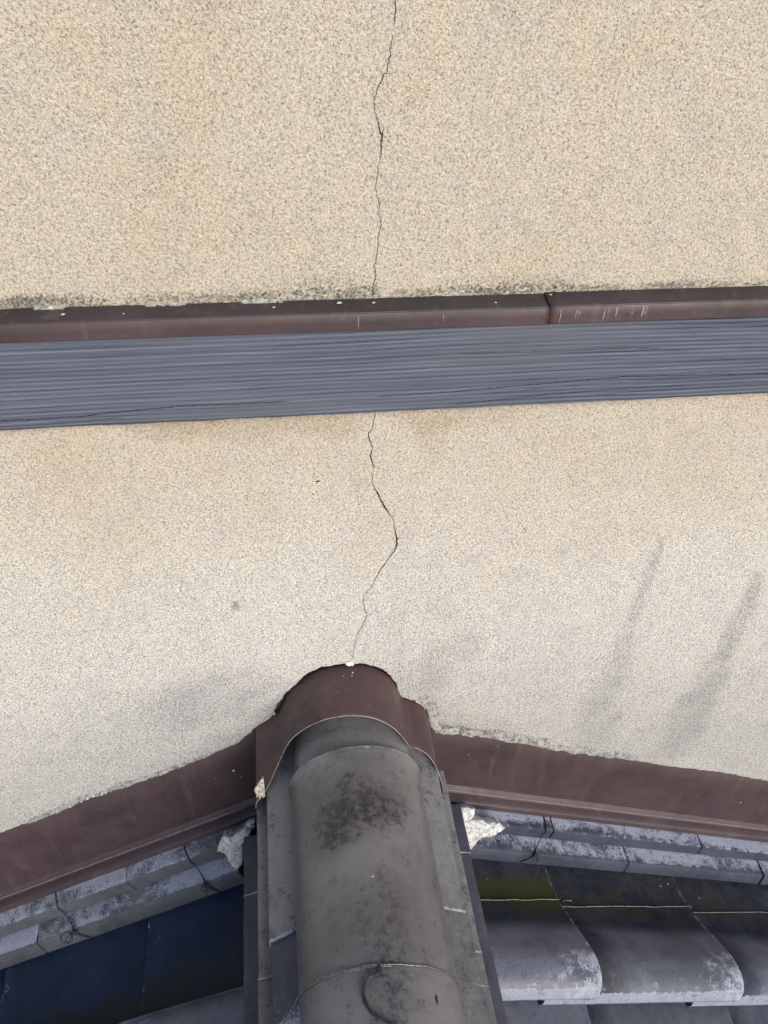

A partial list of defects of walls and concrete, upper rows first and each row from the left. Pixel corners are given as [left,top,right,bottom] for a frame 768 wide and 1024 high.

crack [372,0,396,296]
crack [343,348,768,666]